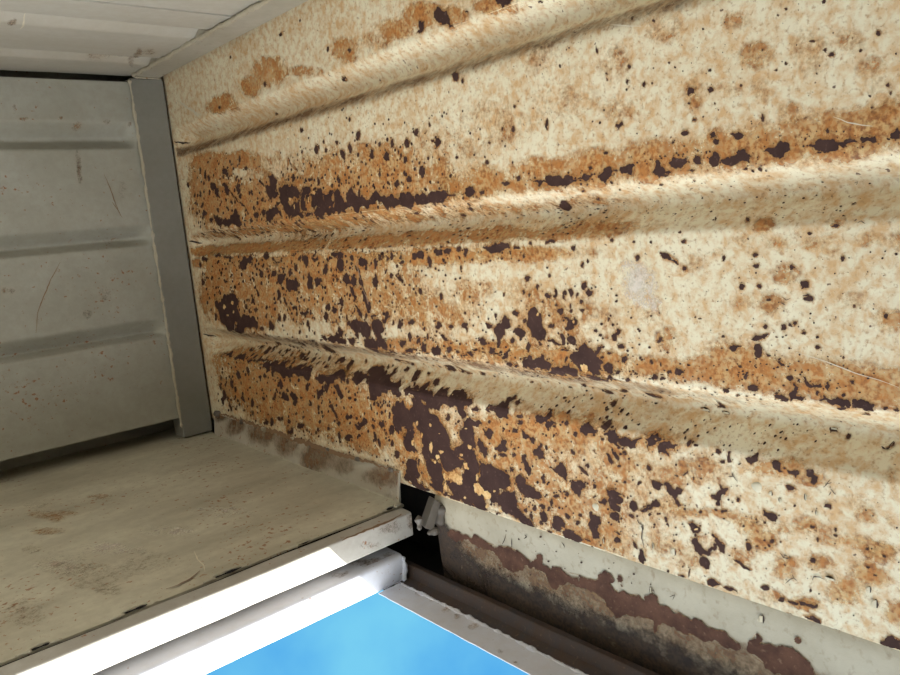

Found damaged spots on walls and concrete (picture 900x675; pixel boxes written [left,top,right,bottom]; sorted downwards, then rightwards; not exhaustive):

corrosion [241,56,323,97]
corrosion [332,0,518,63]
peeling [417,7,455,34]
corrosion [385,36,562,92]
corrosion [605,47,628,71]
corrosion [740,42,770,70]
corrosion [176,93,900,501]
peeling [186,99,900,592]
damp [220,413,399,473]
corrosion [447,409,897,675]
peeling [778,558,822,624]
corrosion [887,601,900,623]